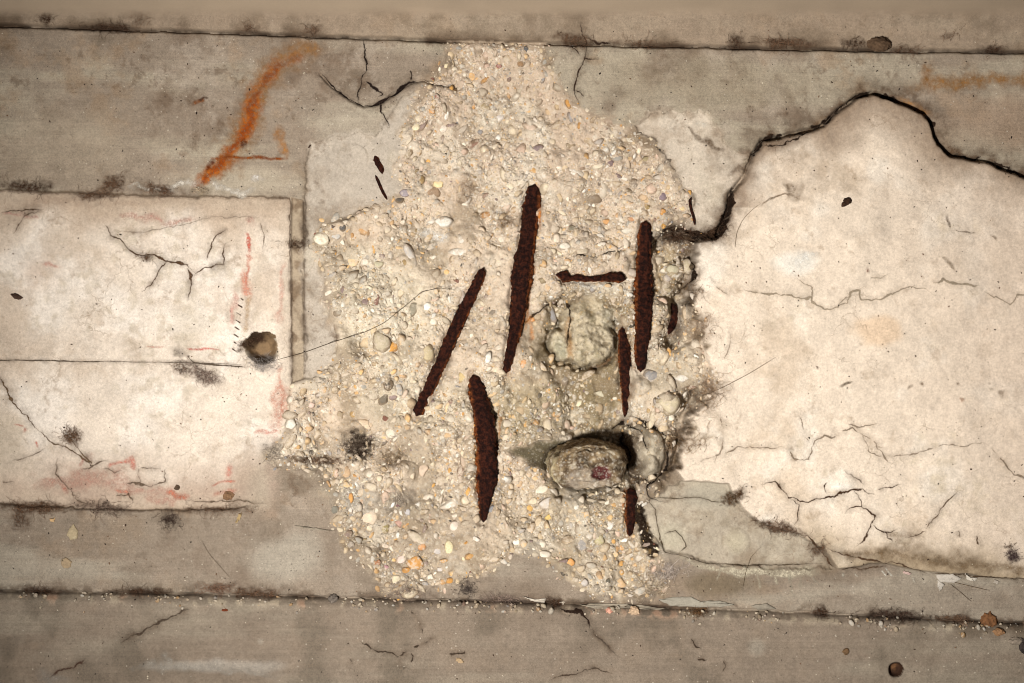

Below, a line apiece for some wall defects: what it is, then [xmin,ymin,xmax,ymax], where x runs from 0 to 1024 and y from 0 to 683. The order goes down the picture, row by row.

corrosion [201,55,287,183]
crack [325,43,457,123]
crack [571,26,608,99]
crack [661,88,1024,297]
crack [108,229,225,297]
crack [162,356,242,367]
spalling [263,41,836,610]
crack [750,278,1024,310]
crack [0,359,166,503]
crack [612,417,1016,580]